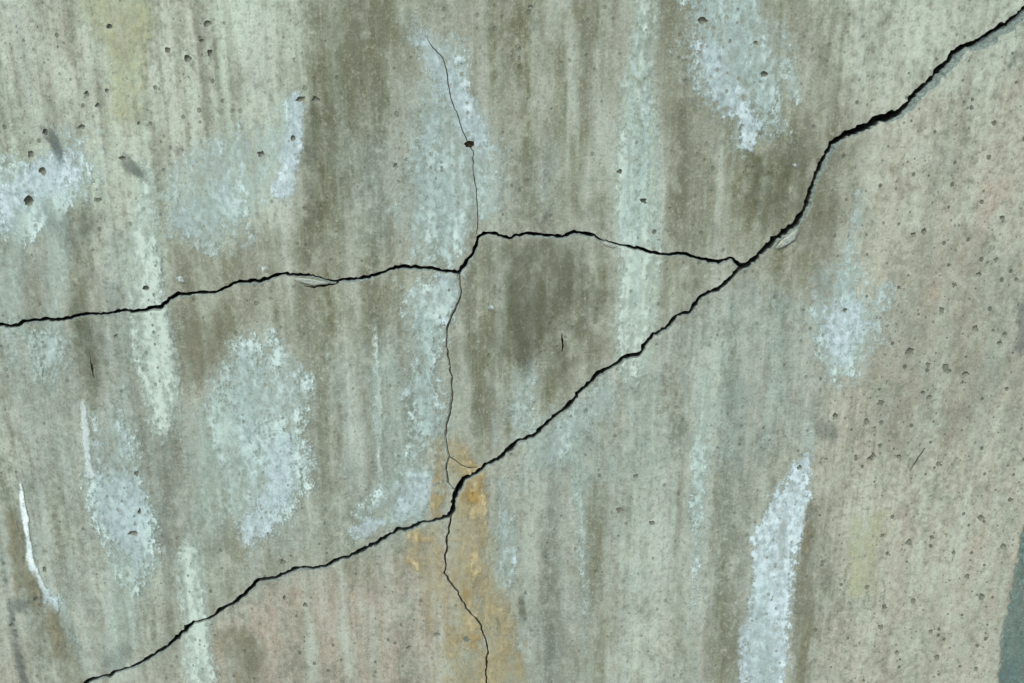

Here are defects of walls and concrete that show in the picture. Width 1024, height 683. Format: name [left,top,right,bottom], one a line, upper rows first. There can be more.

damp [670,0,802,181]
crack [0,230,745,328]
crack [197,6,1024,621]
efflorescence [80,403,219,683]
crack [83,613,219,683]
efflorescence [199,327,317,545]
crack [443,515,489,683]
damp [738,431,814,683]